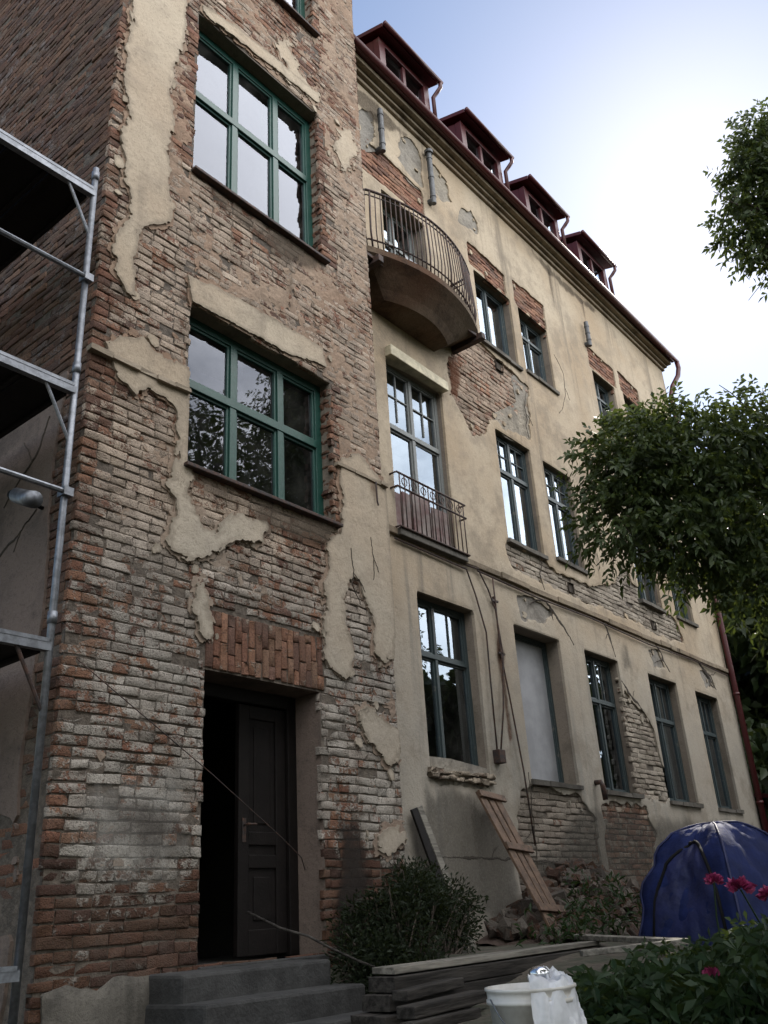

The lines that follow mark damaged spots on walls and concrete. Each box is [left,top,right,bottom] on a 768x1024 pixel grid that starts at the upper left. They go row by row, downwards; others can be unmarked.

flaking render [106,0,321,304]
flaking render [184,274,332,369]
flaking render [447,343,531,443]
flaking render [103,327,271,644]
flaking render [311,448,396,681]
flaking render [505,543,682,643]
flaking render [353,701,402,781]
flaking render [429,756,489,789]
flaking render [517,678,668,886]
flaking render [365,819,408,862]